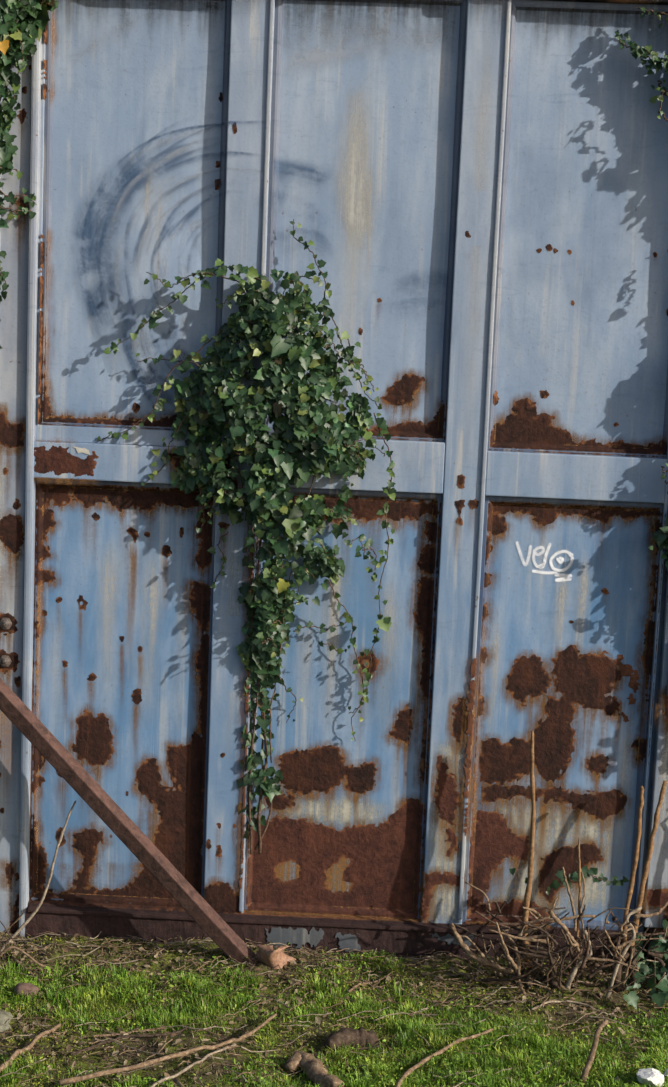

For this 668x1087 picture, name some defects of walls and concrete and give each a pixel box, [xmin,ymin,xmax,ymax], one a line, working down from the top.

corrosion [0,232,668,934]
peeling [265,926,361,954]